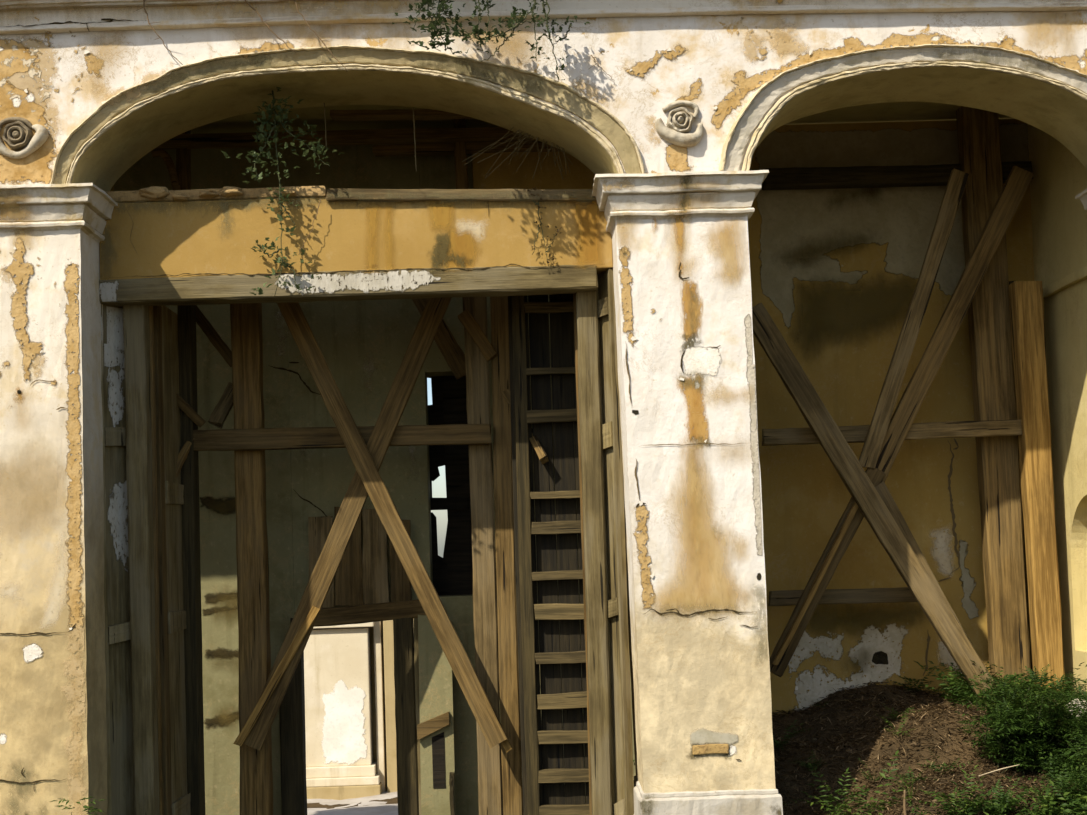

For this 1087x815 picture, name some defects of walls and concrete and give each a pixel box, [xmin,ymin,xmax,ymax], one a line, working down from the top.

peeling [0,31,104,185]
peeling [625,45,686,77]
peeling [711,17,1087,128]
peeling [0,230,47,407]
peeling [275,270,441,296]
peeling [679,335,722,448]
peeling [42,261,86,815]
peeling [23,643,43,662]
crack [0,623,76,635]
crack [645,609,758,628]
peeling [786,623,908,710]
crack [0,768,65,792]